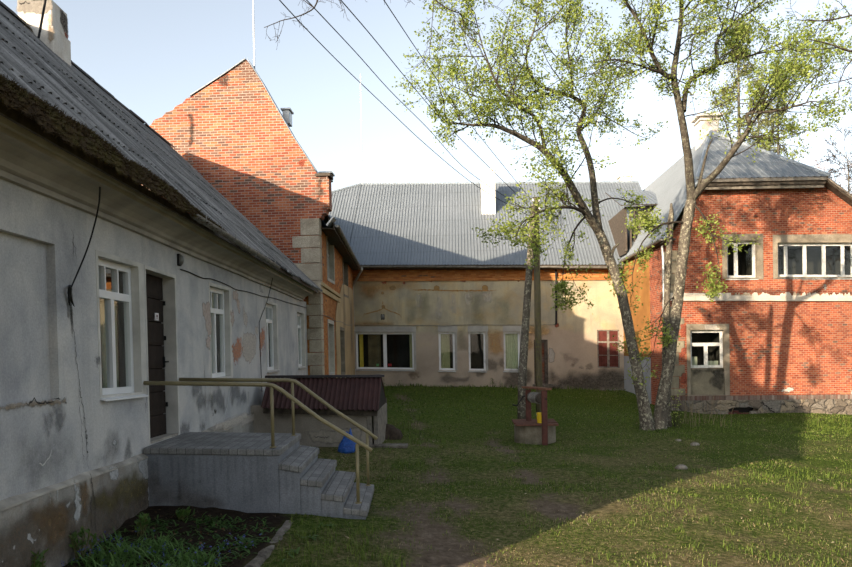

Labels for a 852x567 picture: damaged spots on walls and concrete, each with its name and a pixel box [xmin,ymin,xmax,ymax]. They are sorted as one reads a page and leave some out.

crack [26,316,96,534]
peeling [67,485,81,521]
damp [0,479,149,567]